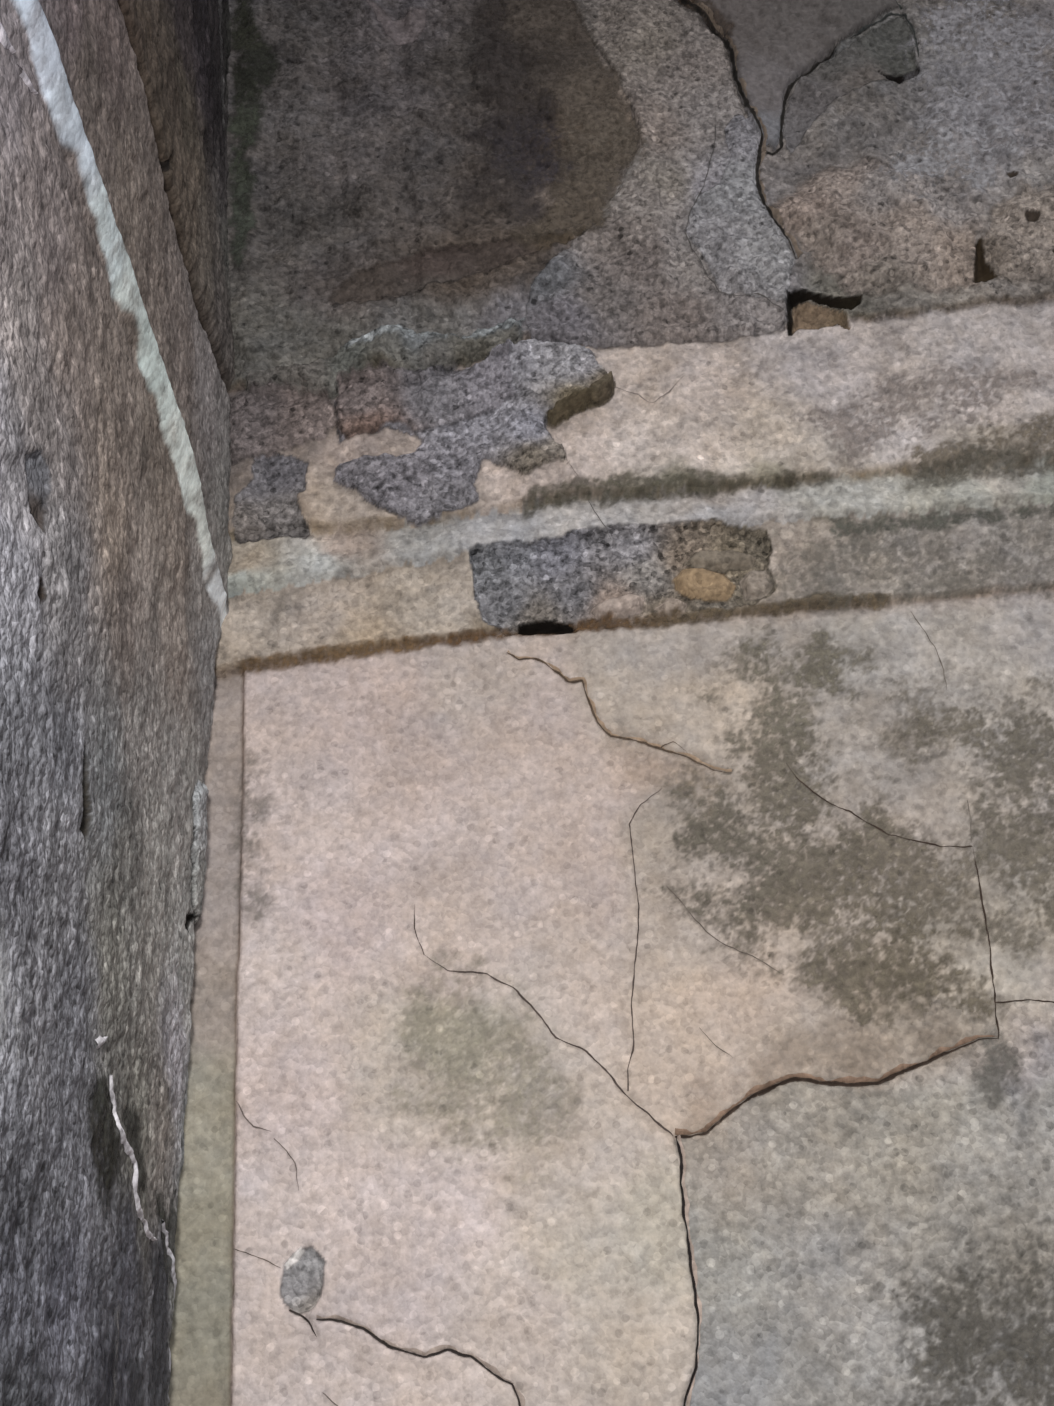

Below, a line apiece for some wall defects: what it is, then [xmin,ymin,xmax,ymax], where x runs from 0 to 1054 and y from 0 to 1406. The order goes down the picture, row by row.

spalling [229,0,917,543]
spalling [469,518,776,636]
damp [569,545,890,632]
damp [241,630,530,672]
crack [911,612,947,690]
crack [507,650,732,773]
damp [661,631,1054,1027]
crack [414,763,1054,1406]
damp [976,1039,1019,1101]
crack [289,1309,525,1406]
damp [891,1252,1054,1406]